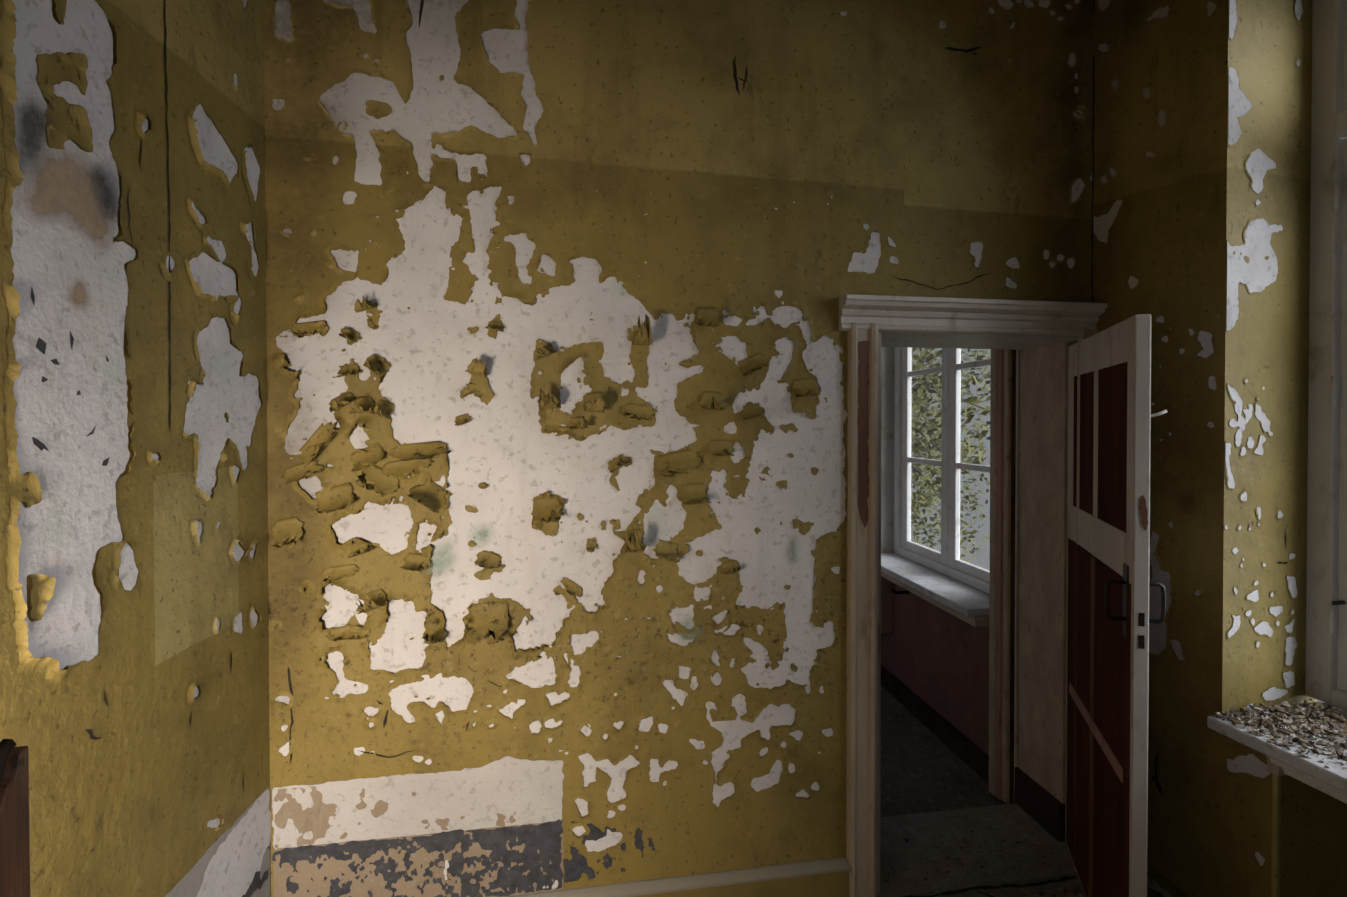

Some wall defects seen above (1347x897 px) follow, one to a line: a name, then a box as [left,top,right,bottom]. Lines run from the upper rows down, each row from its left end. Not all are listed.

peeling [1204,0,1238,41]
peeling [817,221,899,295]
peeling [969,238,986,270]
peeling [1093,197,1124,243]
peeling [1155,66,1283,359]
peeling [0,0,163,685]
peeling [160,0,869,897]
peeling [1206,376,1285,531]
peeling [1227,562,1299,709]